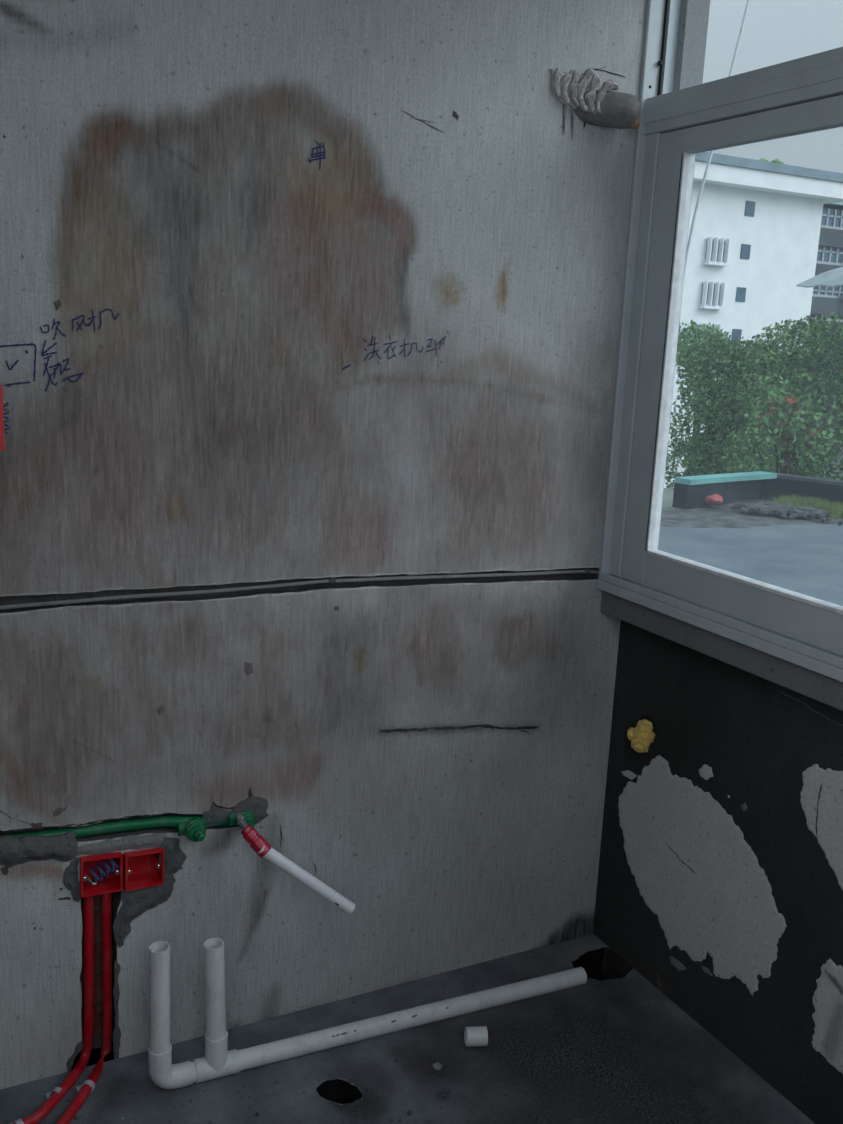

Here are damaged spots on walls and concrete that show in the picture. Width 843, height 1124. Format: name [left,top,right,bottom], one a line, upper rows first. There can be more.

water stain [72,86,418,554]
crack [380,724,538,734]
peeling [618,755,787,996]
peeling [800,764,843,890]
peeling [811,958,843,1073]